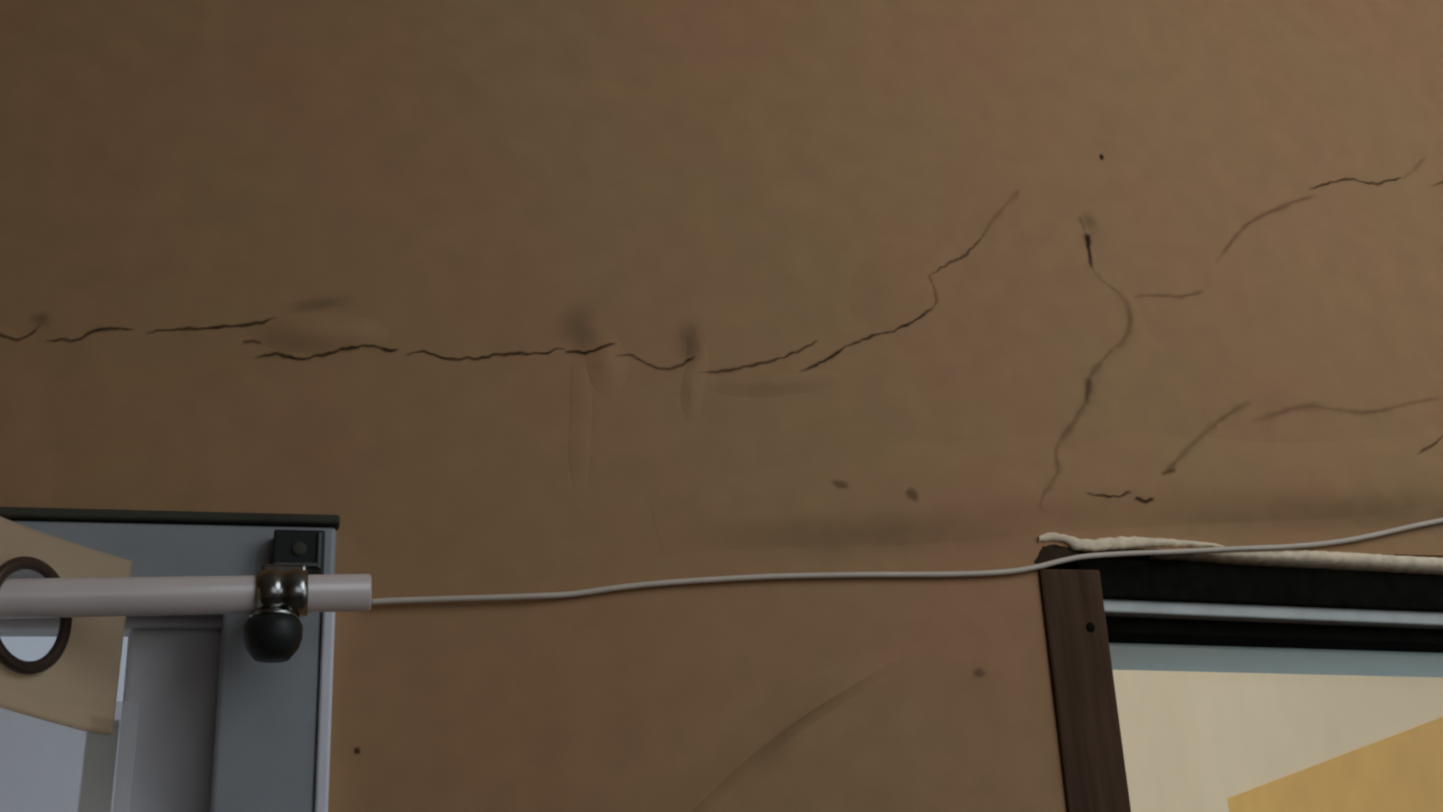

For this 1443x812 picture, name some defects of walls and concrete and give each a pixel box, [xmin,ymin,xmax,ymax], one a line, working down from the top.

crack [1316,178,1399,187]
crack [1085,234,1093,265]
crack [0,311,928,372]
crack [1090,492,1154,503]